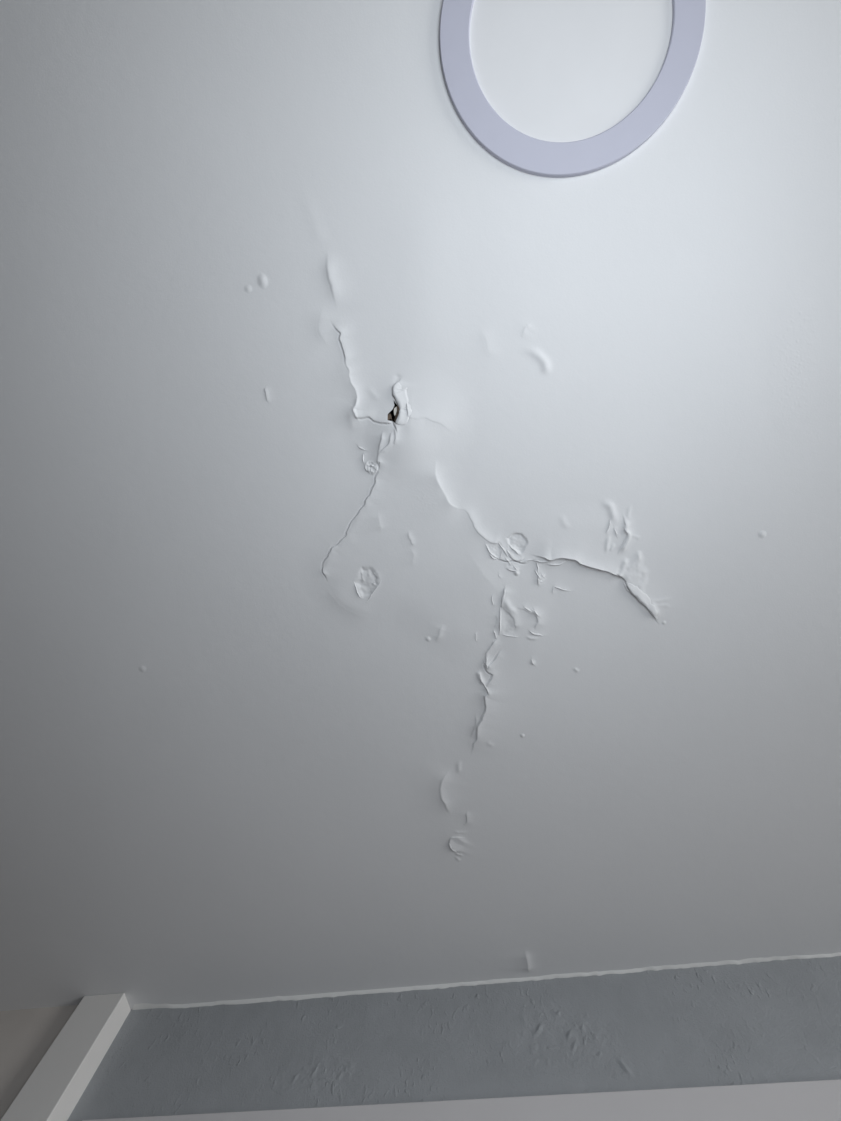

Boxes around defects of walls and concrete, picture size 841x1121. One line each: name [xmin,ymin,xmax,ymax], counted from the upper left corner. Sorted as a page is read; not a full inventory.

crack [315,314,622,624]
spalling [351,565,385,603]
peeling [472,531,574,643]
peeling [615,547,674,626]